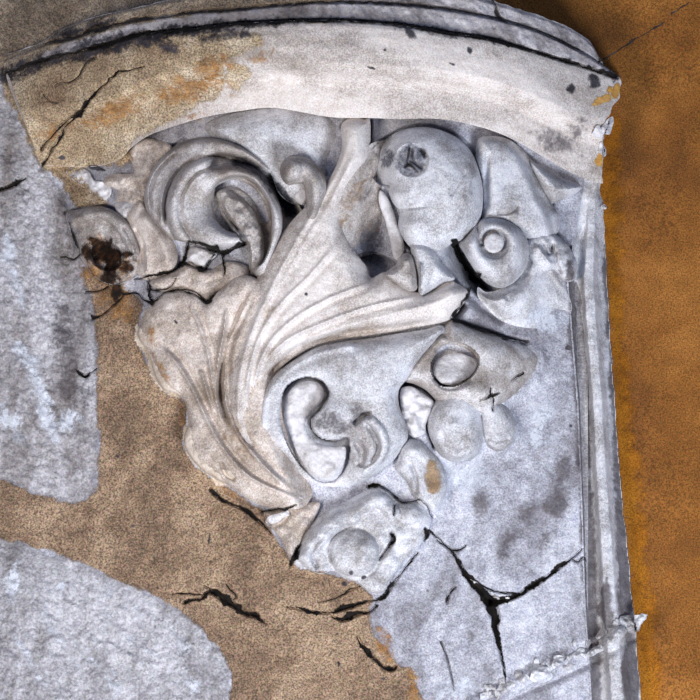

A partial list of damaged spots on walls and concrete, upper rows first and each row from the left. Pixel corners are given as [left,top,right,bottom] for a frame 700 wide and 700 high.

crack [40,66,145,168]
crack [60,222,80,260]
corrosion [80,233,134,321]
crack [85,241,245,320]
spalling [0,0,423,700]
crack [209,489,296,534]
crack [172,584,264,623]
crack [288,483,586,679]